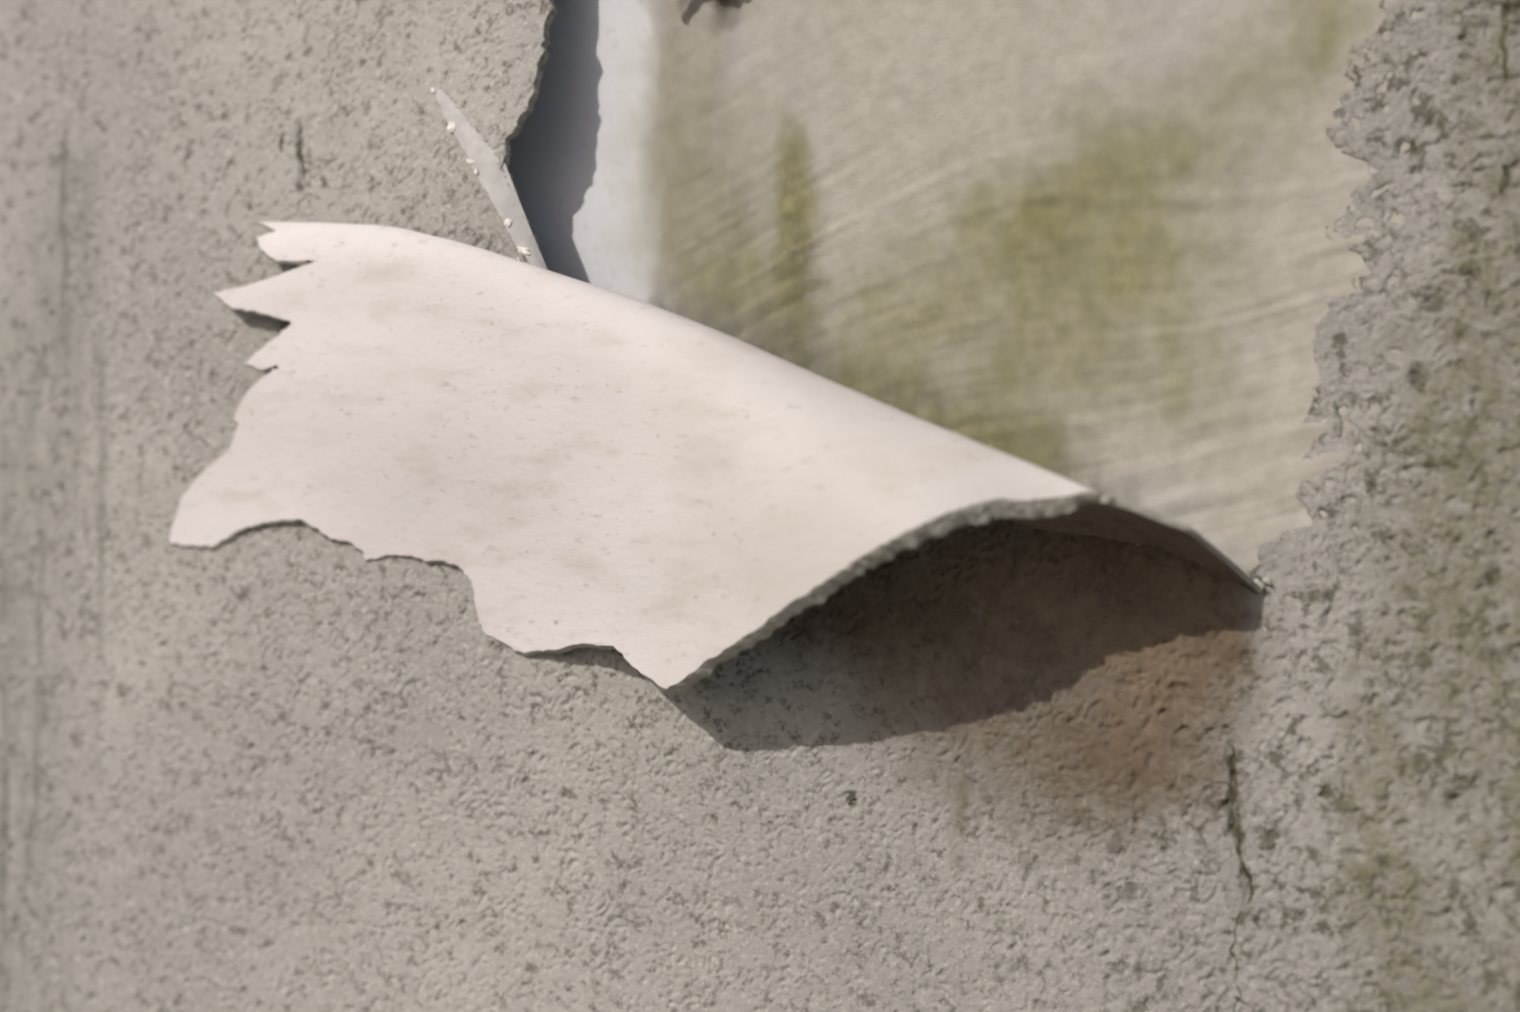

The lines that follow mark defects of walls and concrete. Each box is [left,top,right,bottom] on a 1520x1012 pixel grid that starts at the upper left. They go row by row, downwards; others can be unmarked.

flaking render [168,0,1272,695]
damp [660,0,1404,782]
crack [1213,748,1253,1012]